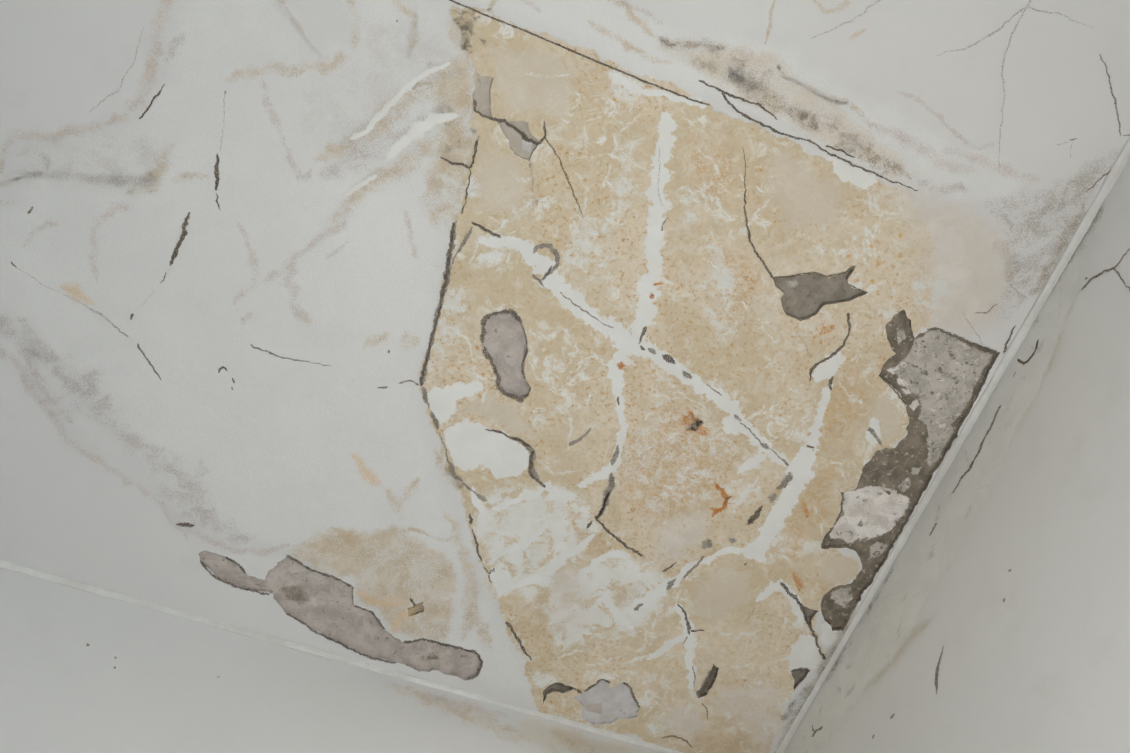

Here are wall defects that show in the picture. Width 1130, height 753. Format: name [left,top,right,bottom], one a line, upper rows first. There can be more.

crack [449,0,918,191]
water stain [477,0,1121,323]
crack [11,212,190,379]
water stain [0,0,652,753]
crack [377,100,583,583]
crack [532,243,613,328]
peeling [418,6,1021,753]
crack [797,313,851,390]
flaking render [199,550,483,681]
crack [587,326,814,719]
crack [780,582,826,659]
water stain [775,596,878,749]